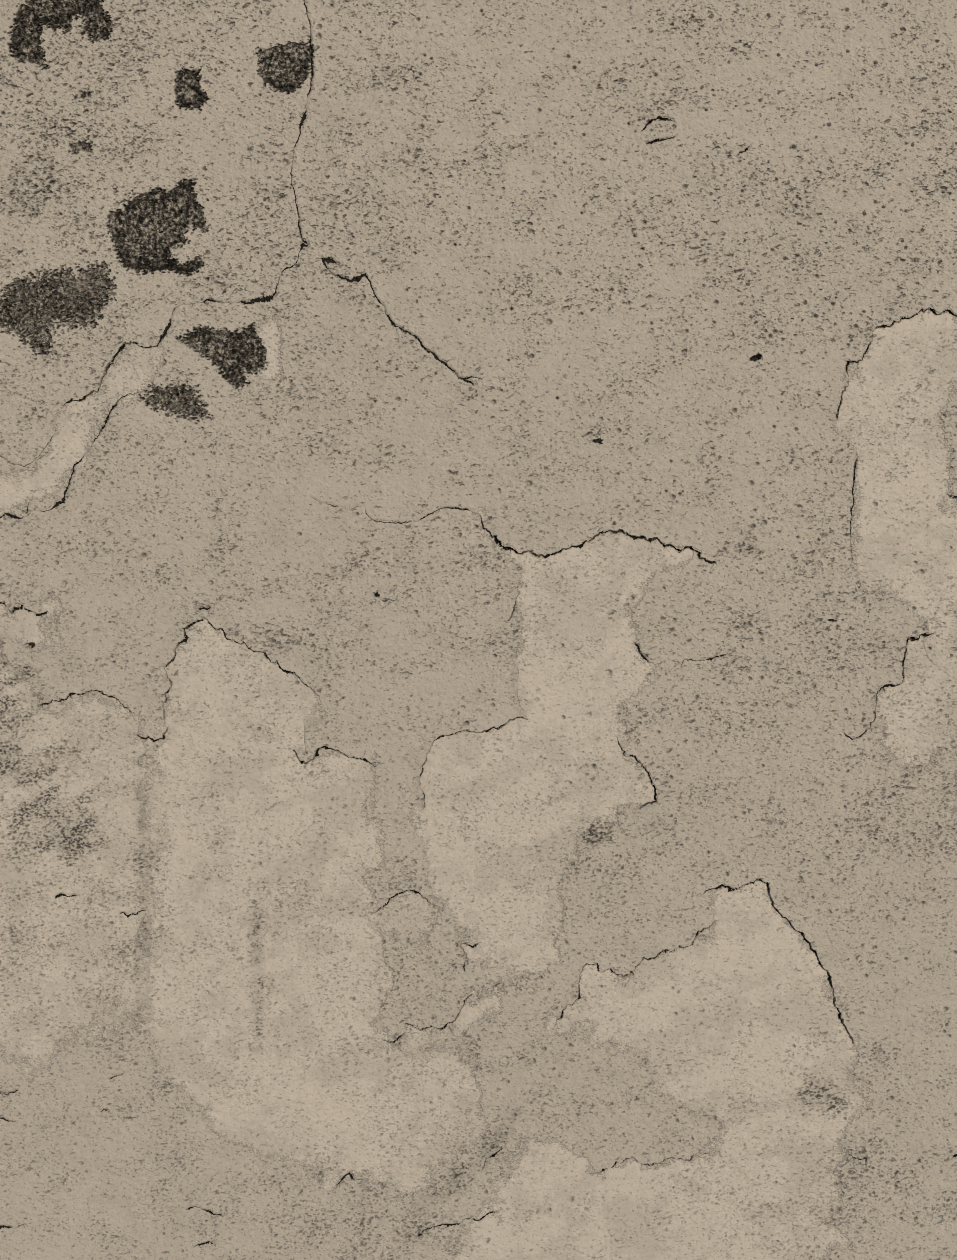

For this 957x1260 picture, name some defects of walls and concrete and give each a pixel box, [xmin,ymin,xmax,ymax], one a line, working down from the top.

crack [157,1,484,385]
flaking render [824,301,957,776]
flaking render [0,507,717,1203]
flaking render [442,871,872,1260]